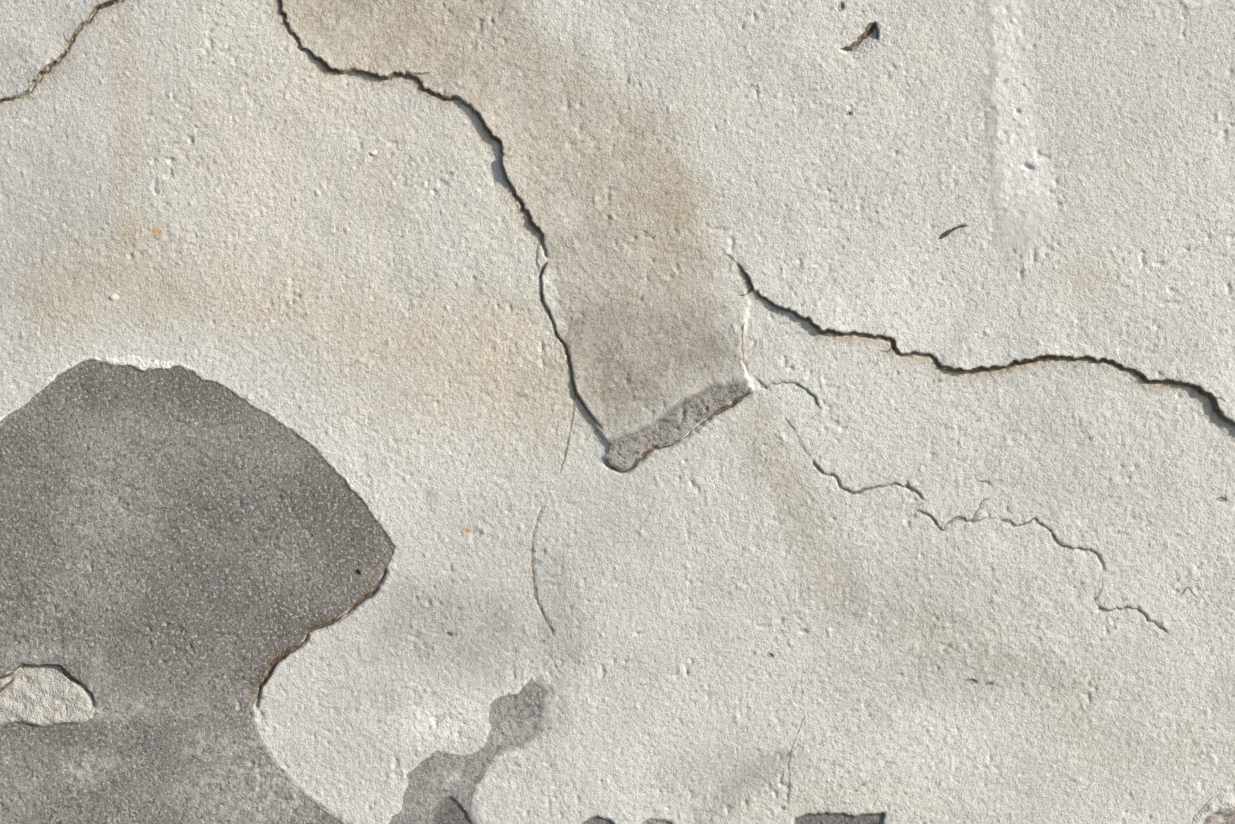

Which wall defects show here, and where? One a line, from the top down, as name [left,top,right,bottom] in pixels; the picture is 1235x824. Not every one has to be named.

crack [0,0,118,101]
crack [279,0,603,474]
crack [939,225,967,239]
crack [724,253,1235,424]
flaking render [604,383,752,473]
flaking render [0,352,396,824]
crack [531,511,554,635]
crack [786,417,1168,633]
flaking render [389,679,547,824]
crack [788,682,805,801]
flaking render [1193,789,1235,824]